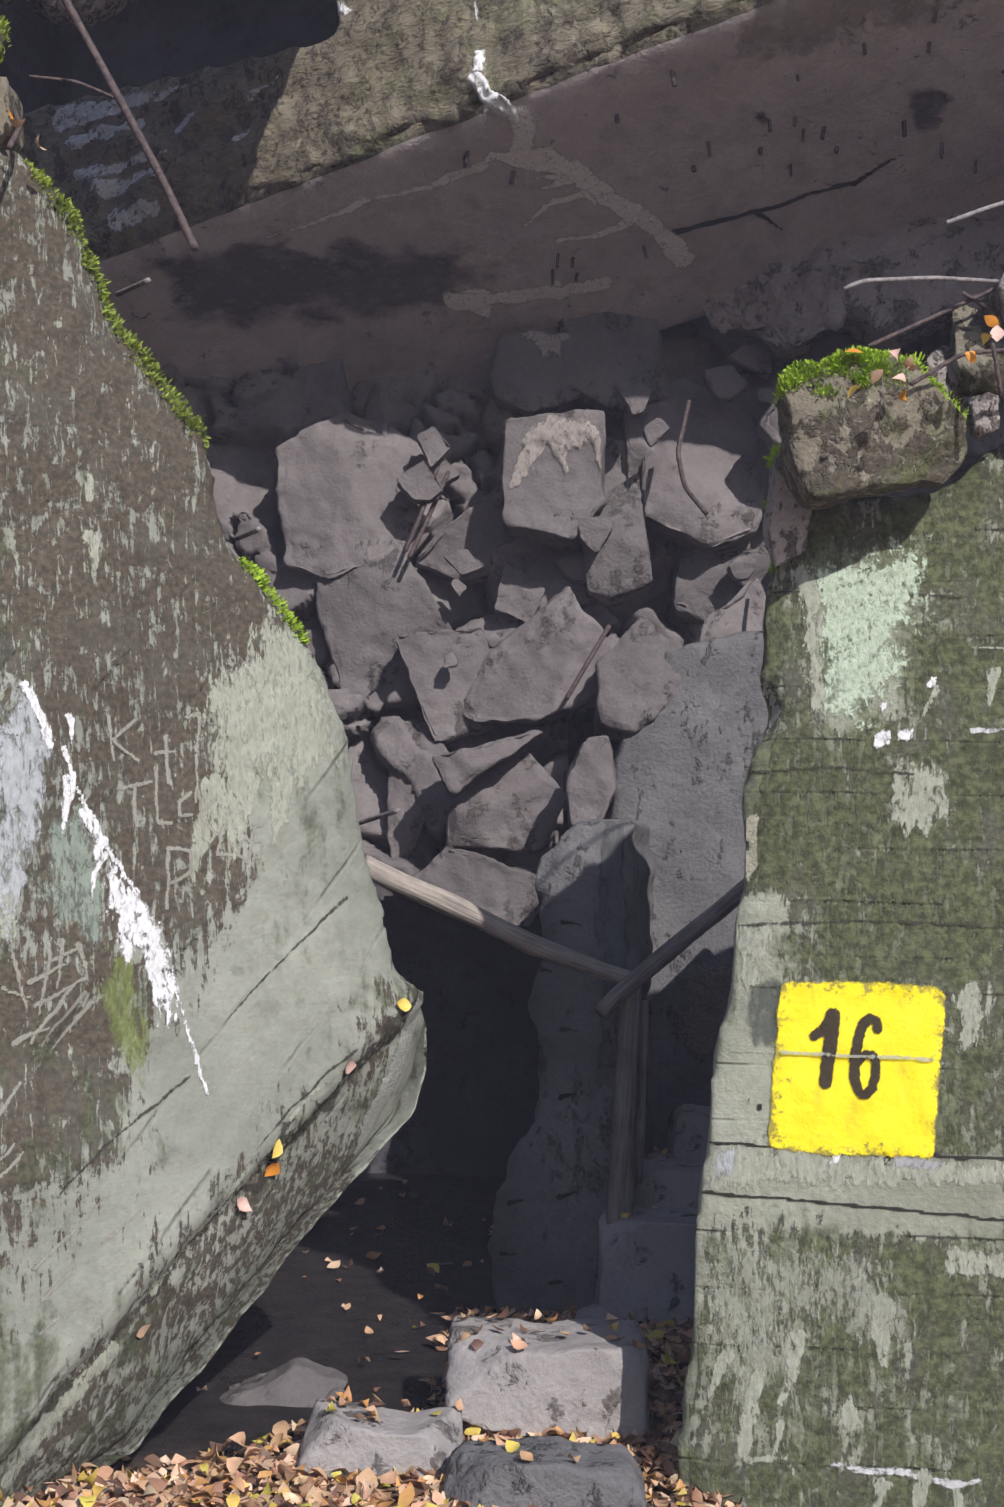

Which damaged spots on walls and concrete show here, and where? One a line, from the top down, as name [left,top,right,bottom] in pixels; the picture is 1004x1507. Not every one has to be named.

crack [233,106,902,269]
crack [443,276,613,319]